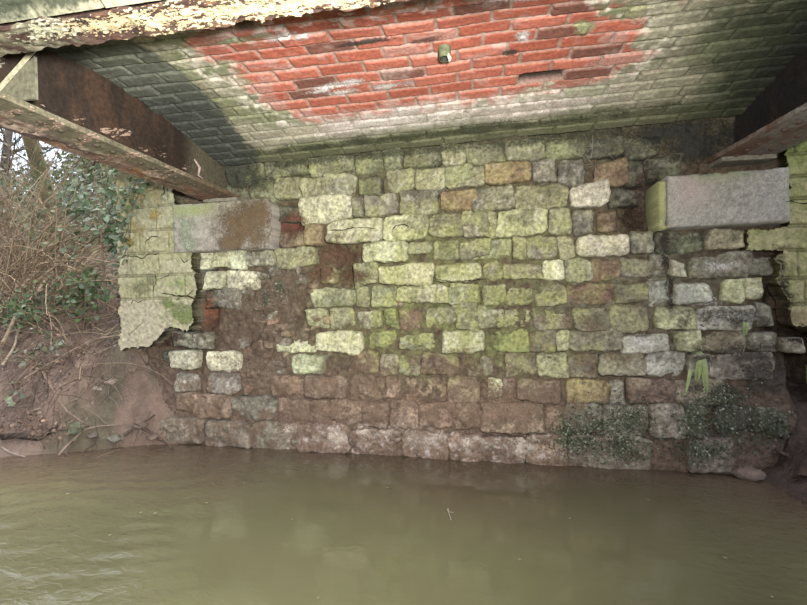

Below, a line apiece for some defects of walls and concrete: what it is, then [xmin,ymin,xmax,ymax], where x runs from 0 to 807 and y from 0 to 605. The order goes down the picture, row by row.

peeling [6,0,396,54]
spalling [305,235,367,283]